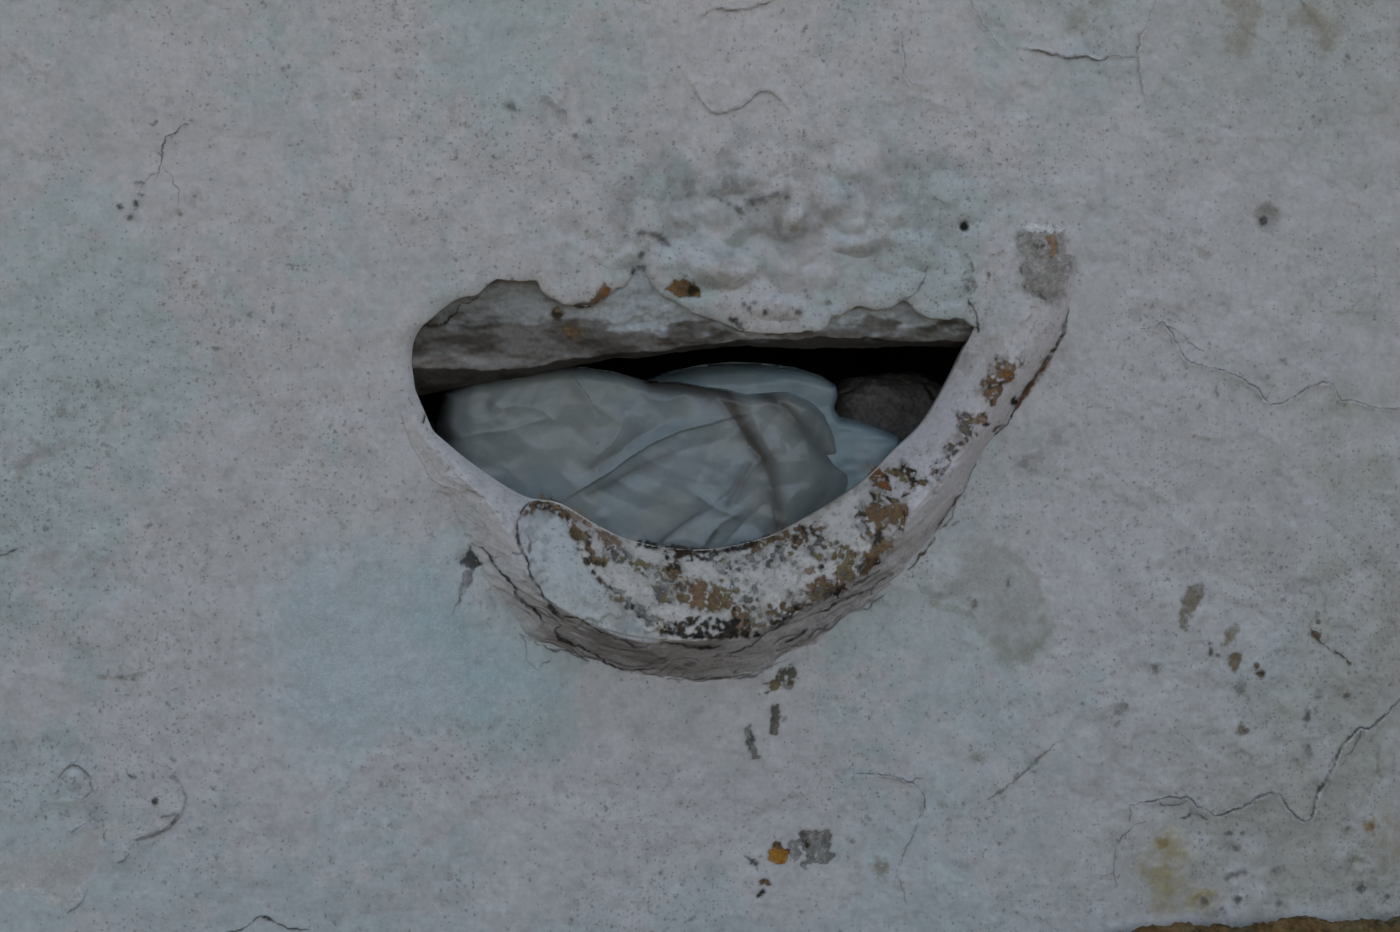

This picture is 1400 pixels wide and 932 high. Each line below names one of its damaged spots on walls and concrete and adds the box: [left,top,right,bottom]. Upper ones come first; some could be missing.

crack [1026,49,1107,61]
crack [158,126,181,194]
spalling [1017,222,1075,302]
crack [1141,322,1392,409]
peeling [525,358,1023,636]
spalling [460,547,481,570]
crack [1114,703,1397,884]
crack [229,916,309,932]